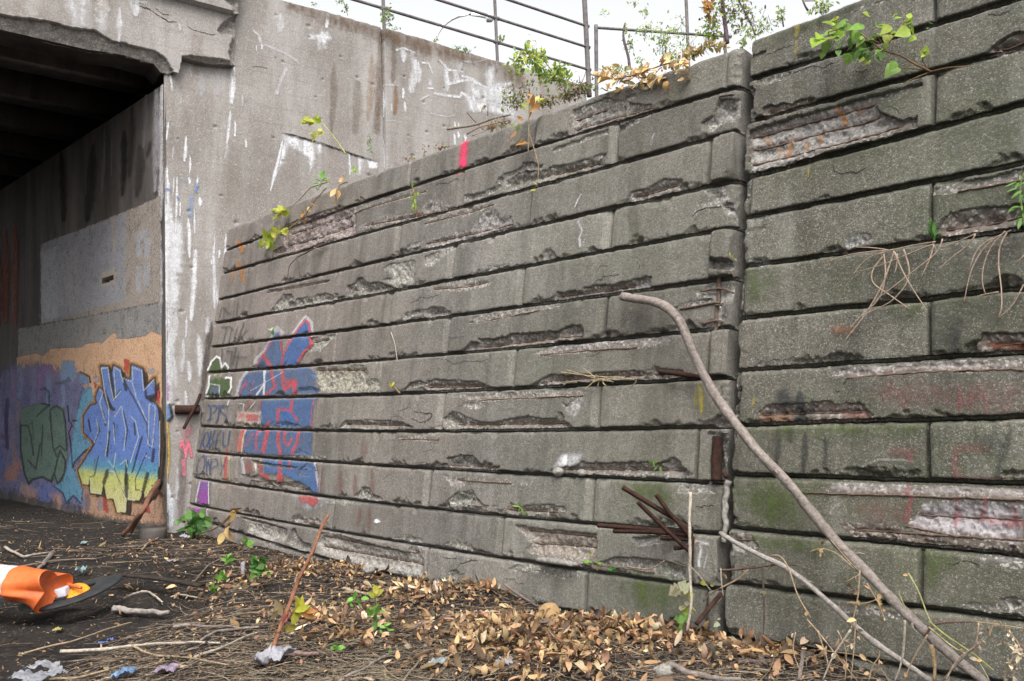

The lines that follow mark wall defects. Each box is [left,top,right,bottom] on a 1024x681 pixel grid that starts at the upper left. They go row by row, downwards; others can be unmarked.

spalling [693,71,923,236]
spalling [267,154,607,314]
spalling [937,205,1024,242]
spalling [465,326,673,357]
spalling [829,333,1024,379]
rust [182,393,202,429]
spalling [340,366,687,441]
spalling [758,401,876,426]
spalling [430,455,687,581]
rust [597,485,700,562]